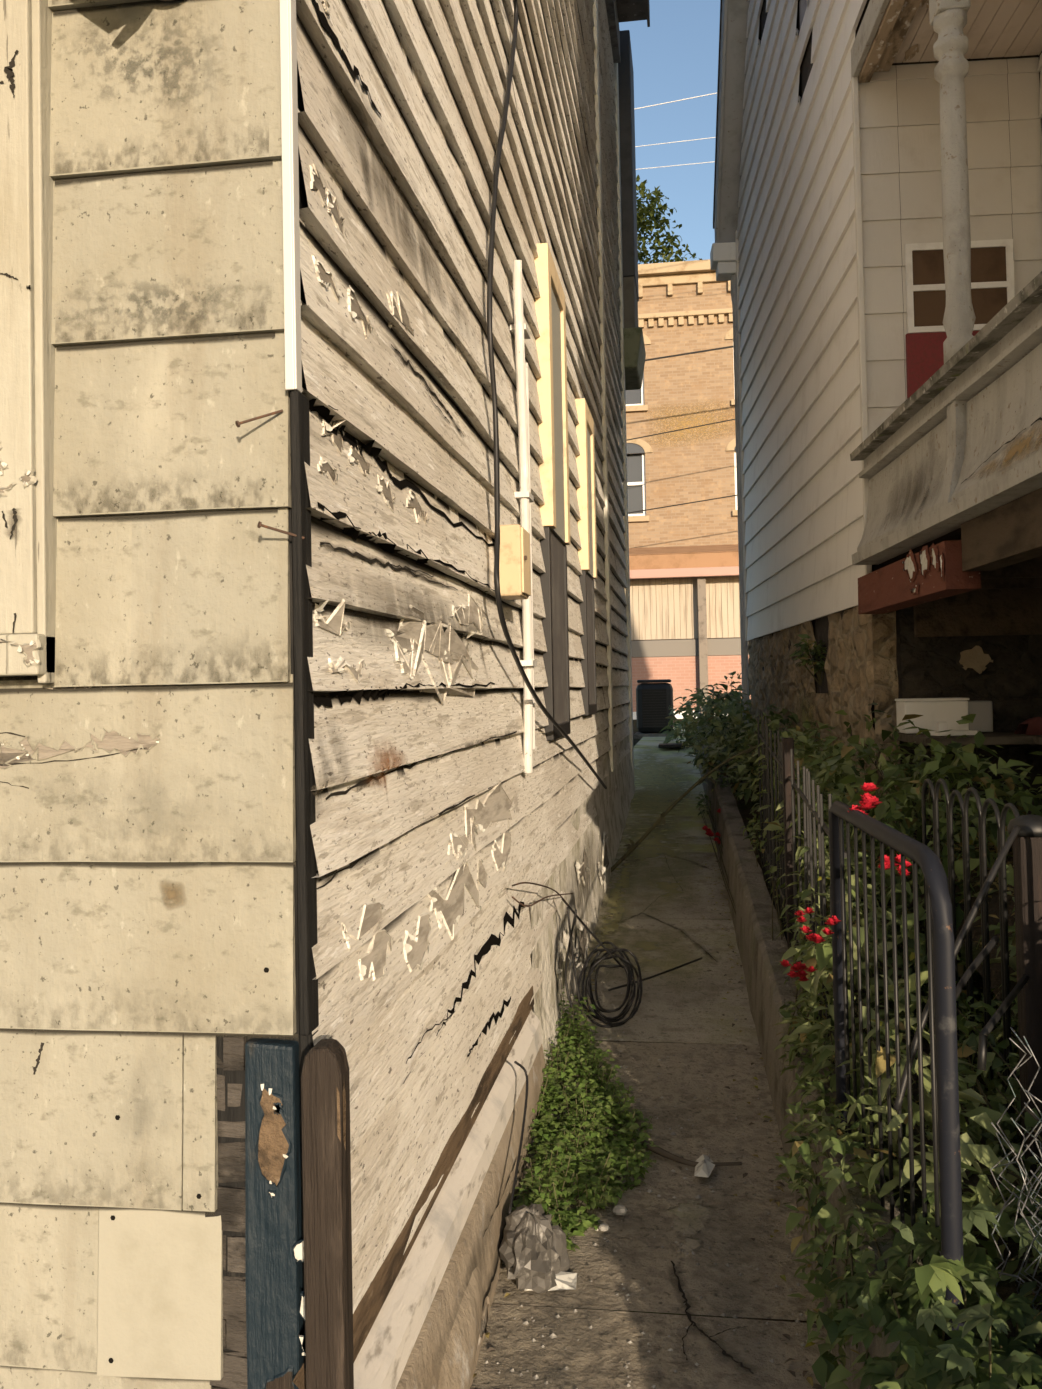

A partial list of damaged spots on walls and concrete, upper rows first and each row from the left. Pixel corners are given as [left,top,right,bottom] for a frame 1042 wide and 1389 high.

spalling [0,50,19,98]
peeling [0,441,37,497]
crack [320,542,458,590]
peeling [903,543,944,595]
peeling [0,638,41,668]
peeling [315,599,350,635]
peeling [444,596,486,677]
peeling [0,730,159,769]
peeling [255,1084,292,1199]
peeling [292,1238,304,1264]
peeling [264,1288,306,1389]
crack [671,1261,754,1374]